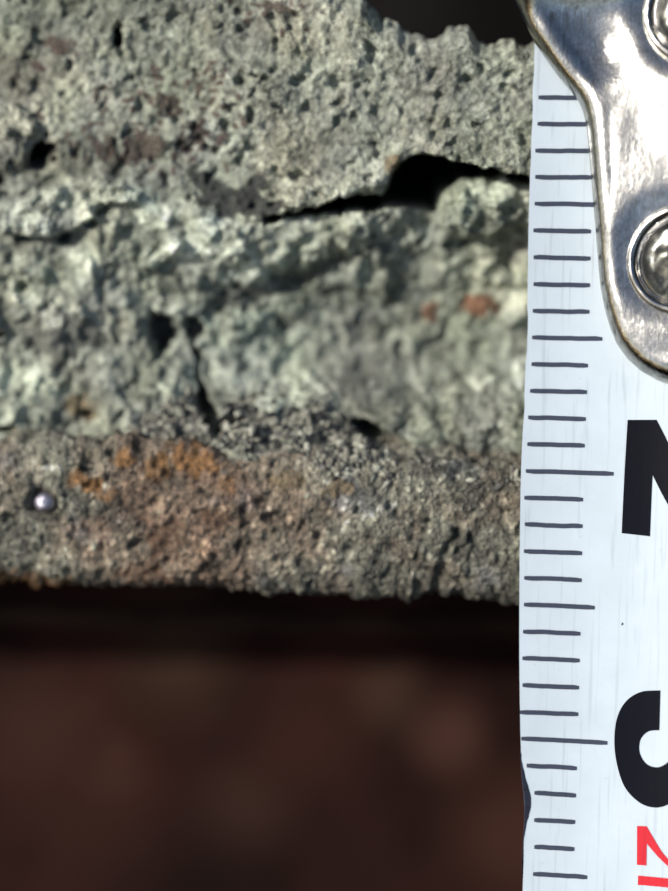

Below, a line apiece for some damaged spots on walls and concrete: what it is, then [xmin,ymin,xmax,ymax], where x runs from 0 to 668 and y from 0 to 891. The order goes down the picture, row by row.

crack [264,153,530,220]
rust [114,446,135,468]
rust [145,440,220,480]
rust [70,470,103,493]